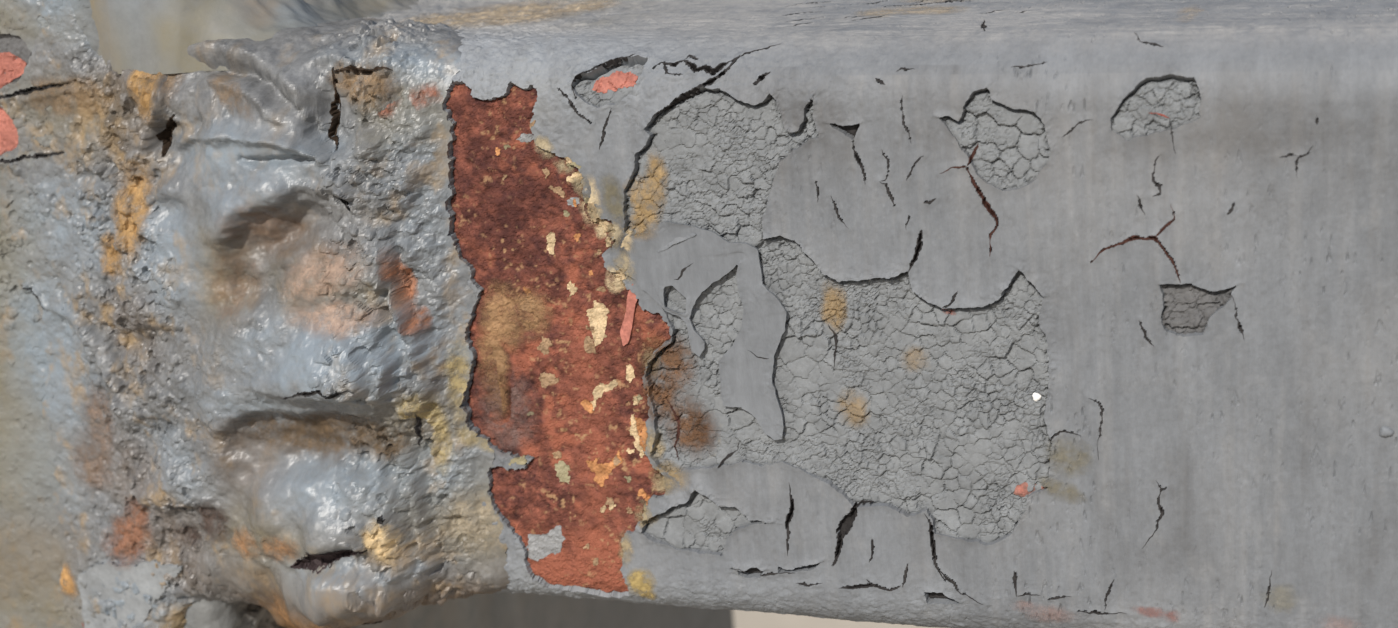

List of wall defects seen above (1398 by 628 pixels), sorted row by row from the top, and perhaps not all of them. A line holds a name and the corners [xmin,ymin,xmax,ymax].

peeling [1112,79,1201,140]
crack [815,181,848,228]
crack [853,68,998,272]
crack [1094,113,1181,283]
crack [1279,117,1318,176]
corrosion [252,84,710,598]
peeling [612,90,1052,543]
peeling [1162,283,1235,334]
peeling [644,492,759,554]
crack [734,484,983,605]
crack [1144,482,1166,546]
crack [1013,571,1125,615]